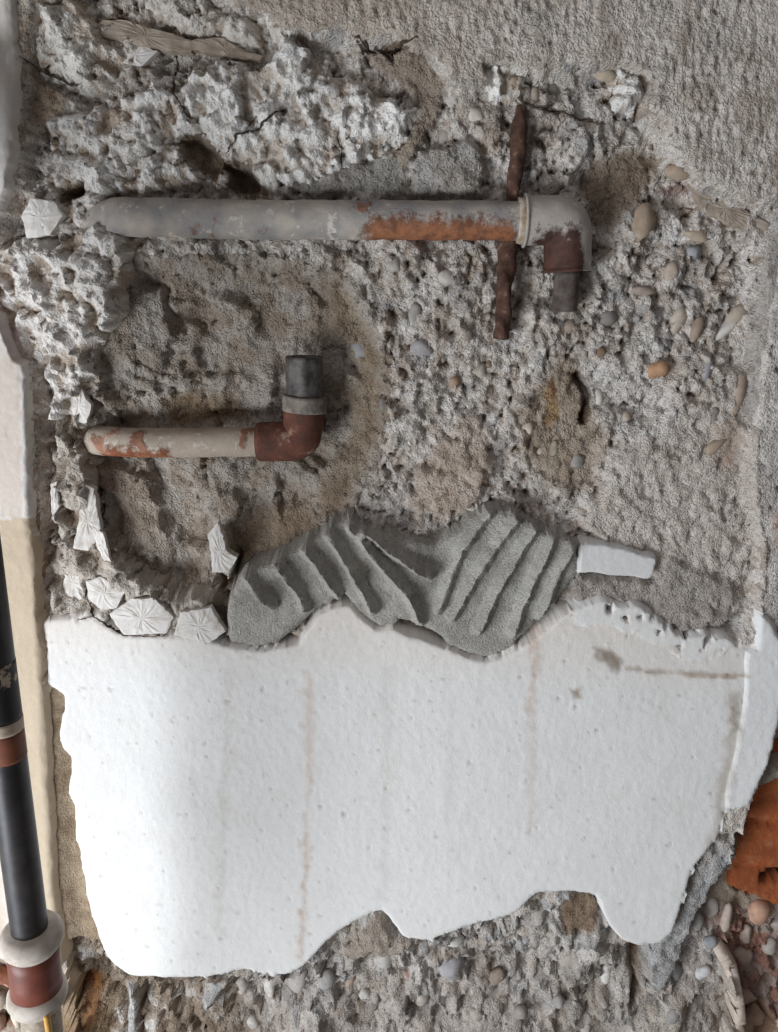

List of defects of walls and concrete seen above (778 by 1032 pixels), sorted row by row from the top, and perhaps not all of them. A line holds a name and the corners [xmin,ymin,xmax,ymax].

rust [506,104,528,201]
spalling [0,0,778,661]
rust [493,240,517,340]
spalling [50,687,746,1032]
spalling [0,1009,21,1032]